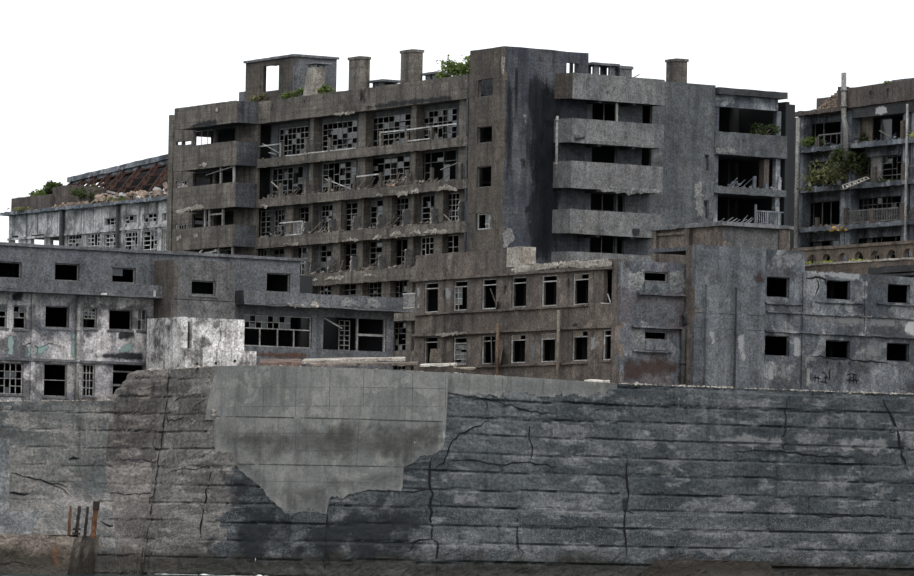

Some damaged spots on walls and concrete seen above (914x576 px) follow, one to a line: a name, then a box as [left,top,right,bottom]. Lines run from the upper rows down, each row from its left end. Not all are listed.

leakage [102,352,142,360]
crack [883,399,909,471]
crack [9,473,72,497]
crack [403,393,556,572]
crack [619,459,632,555]